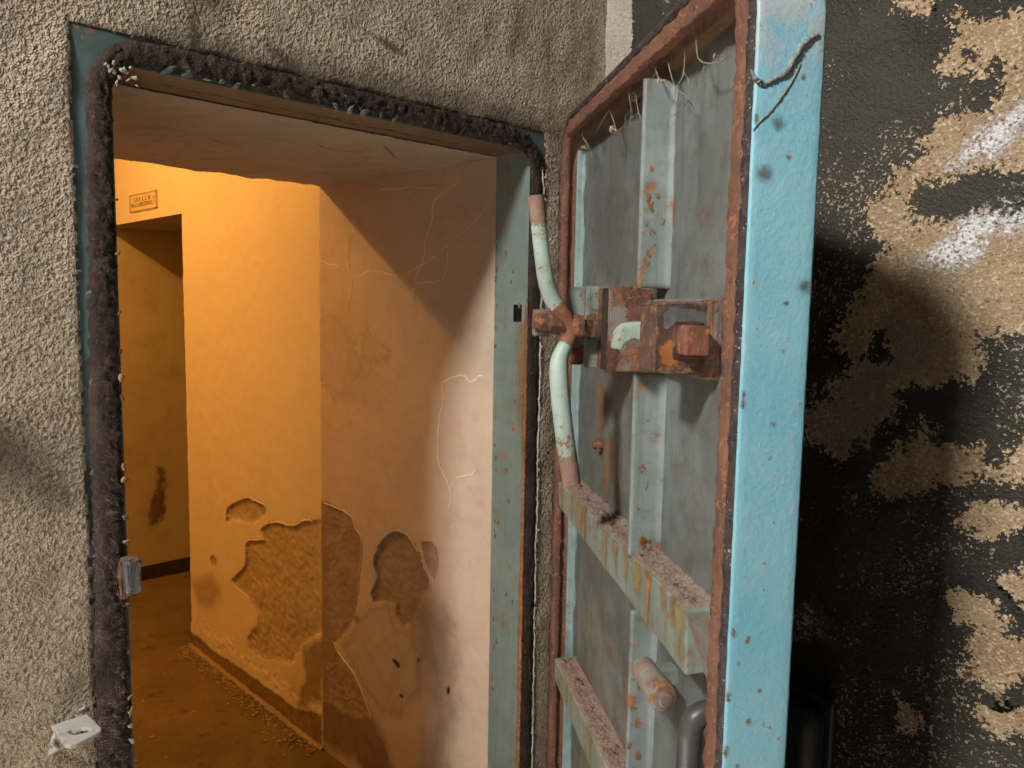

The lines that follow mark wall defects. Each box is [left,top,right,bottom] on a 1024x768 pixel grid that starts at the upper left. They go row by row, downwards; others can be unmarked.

water stain [149,467,166,525]
flaking render [225,496,439,718]
crack [437,374,487,509]
corrosion [546,0,758,768]